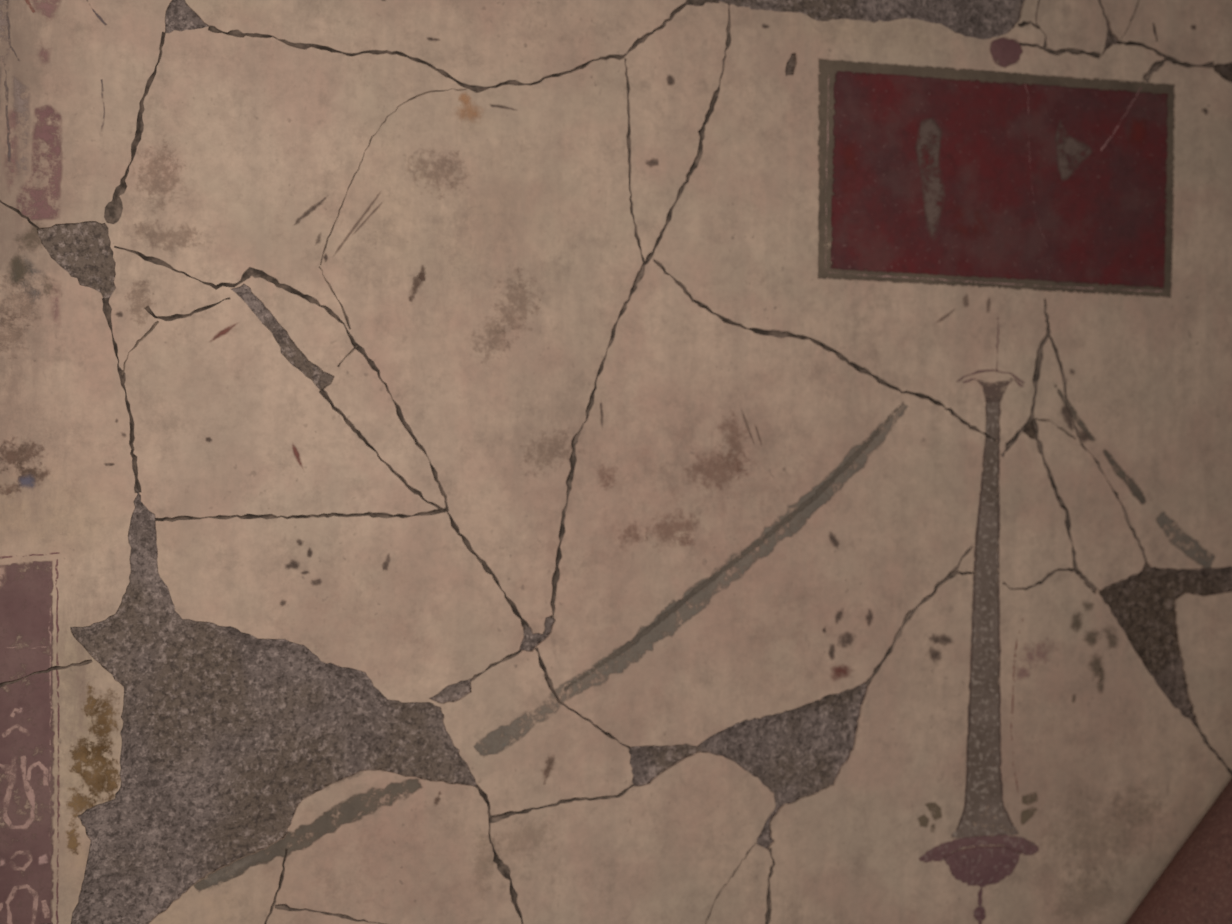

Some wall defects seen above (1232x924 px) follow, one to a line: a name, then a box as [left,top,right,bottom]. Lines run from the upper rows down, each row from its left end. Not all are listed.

flaking render [717,0,1024,39]
crack [1018,0,1215,151]
flaking render [37,221,116,300]
flaking render [231,284,334,392]
crack [102,0,1147,750]
crack [0,659,92,687]
flaking render [70,489,477,924]
flaking render [629,683,867,849]
flaking render [1098,562,1232,727]
crack [264,849,383,924]
crack [475,784,634,924]
crack [705,843,775,924]